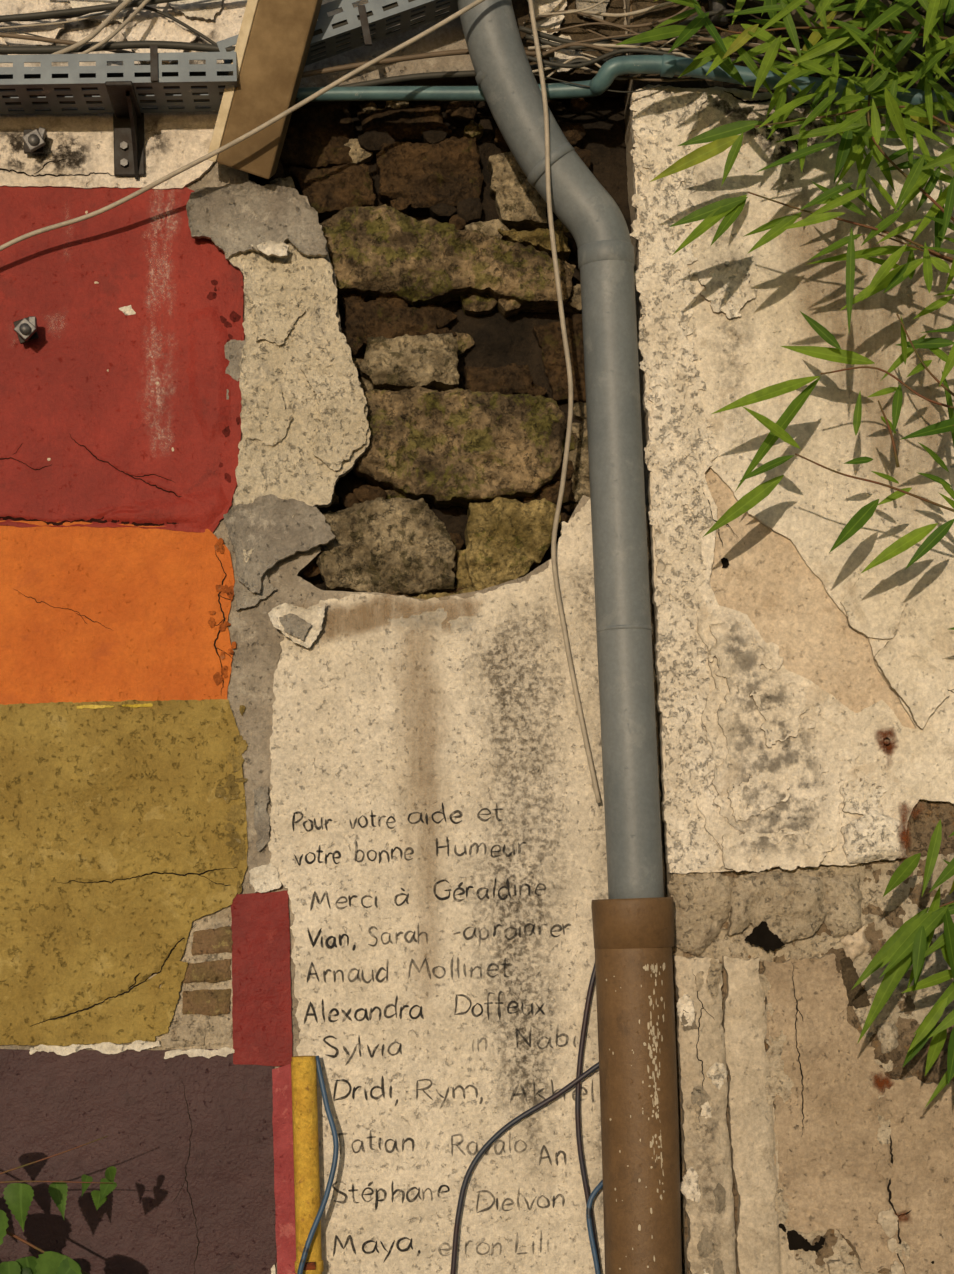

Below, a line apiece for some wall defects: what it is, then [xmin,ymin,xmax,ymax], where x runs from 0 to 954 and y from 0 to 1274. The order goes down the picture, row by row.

flaking render [511,0,823,77]
flaking render [808,36,954,93]
crack [0,159,123,177]
crack [0,434,182,526]
flaking render [29,101,590,1059]
flaking render [547,74,954,1214]
water stain [489,642,544,794]
rust [877,730,896,754]
water stain [504,812,546,930]
crack [30,924,196,1027]
flaking render [774,1187,910,1274]
crack [876,1100,911,1273]